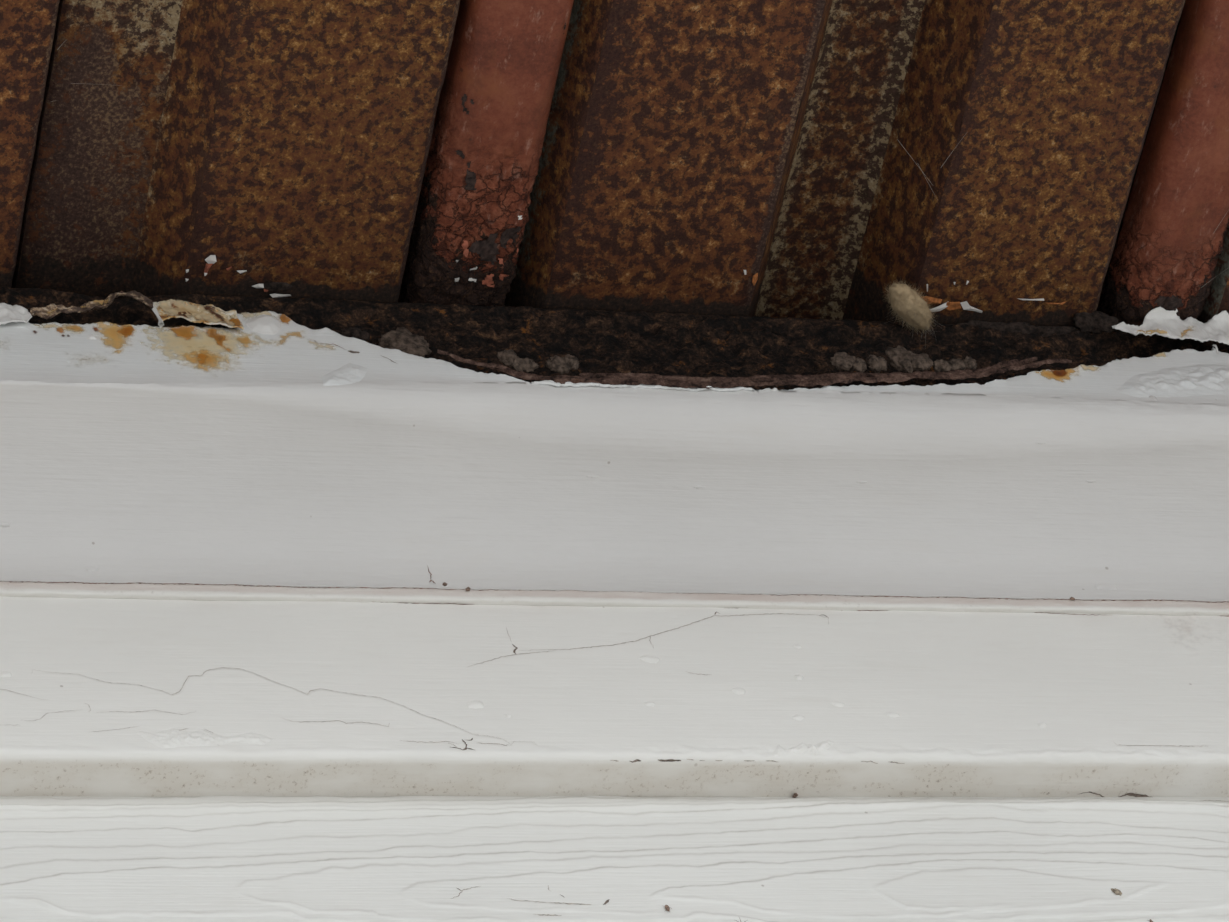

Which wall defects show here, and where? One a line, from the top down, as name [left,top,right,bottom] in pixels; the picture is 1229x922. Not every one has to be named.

peeling [455,150,477,191]
peeling [204,255,247,276]
peeling [455,216,522,287]
peeling [0,290,291,329]
peeling [252,282,293,298]
peeling [922,284,983,313]
peeling [1112,295,1229,354]
corrosion [34,322,332,370]
crack [0,581,494,605]
crack [471,590,1228,666]
crack [3,667,507,750]